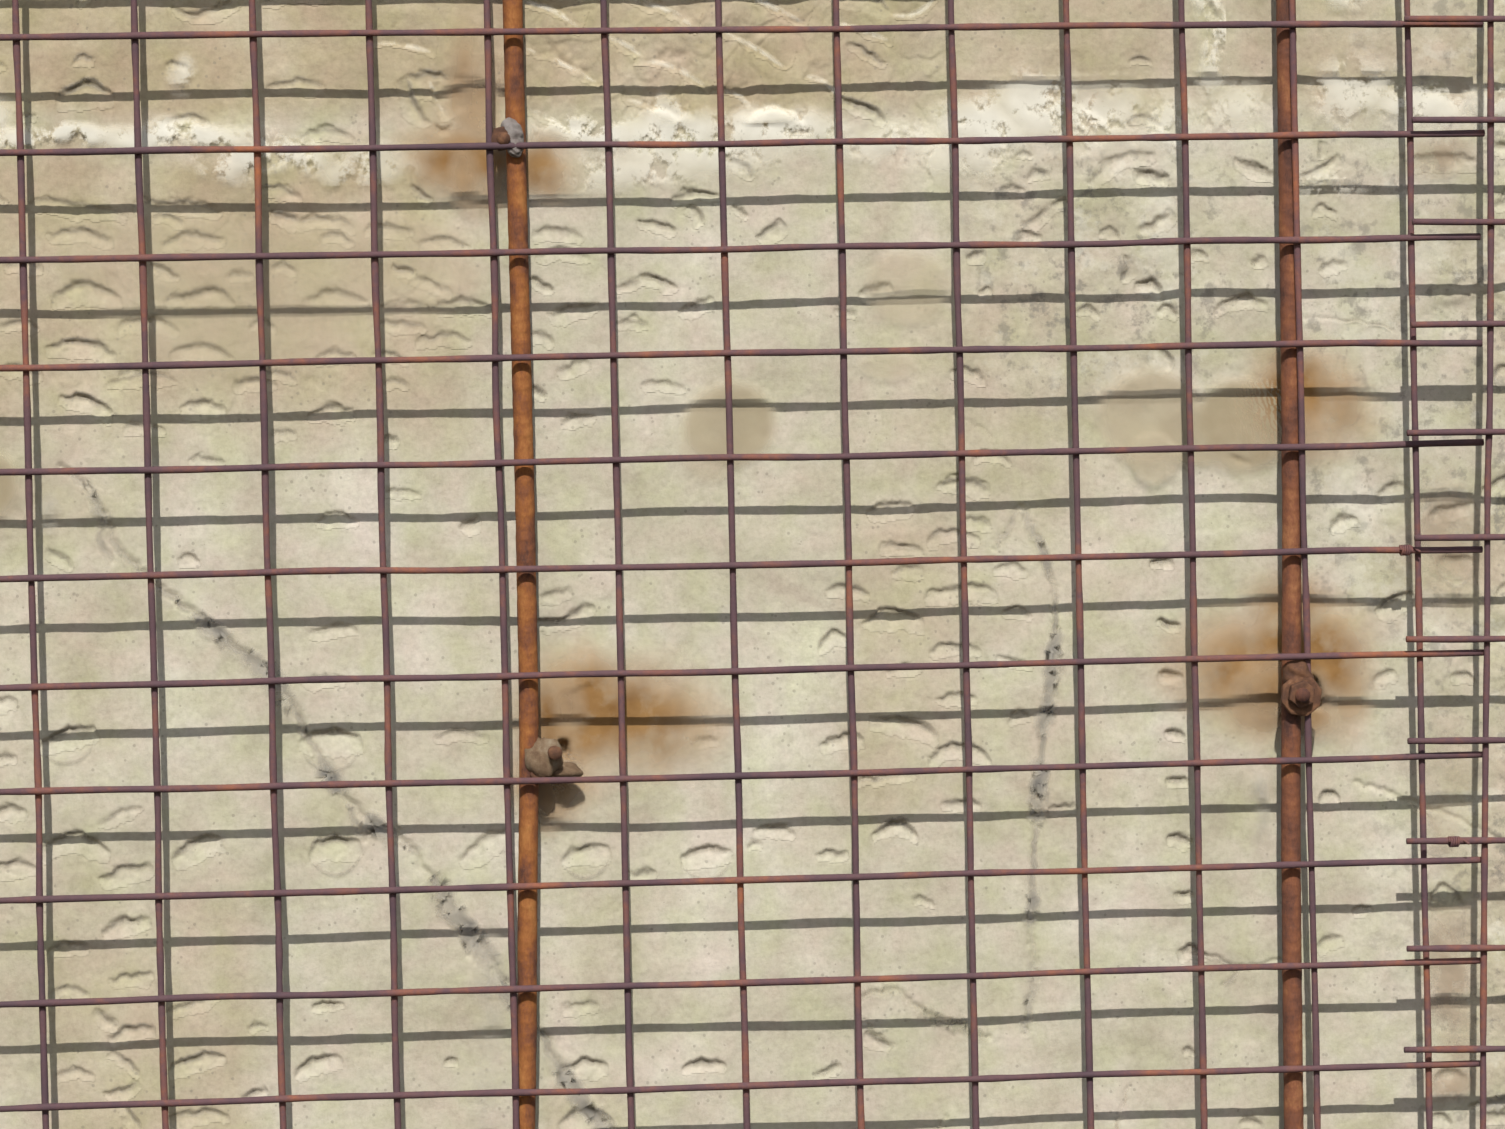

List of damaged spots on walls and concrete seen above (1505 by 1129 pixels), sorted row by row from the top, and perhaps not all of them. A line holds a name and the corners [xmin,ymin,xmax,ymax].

water stain [0,115,317,173]
water stain [546,102,827,177]
water stain [948,81,1120,163]
water stain [687,386,771,463]
water stain [1108,376,1282,469]
corrosion [1198,583,1282,732]
corrosion [1301,580,1363,731]
crack [137,568,490,957]
corrosion [538,654,705,815]
crack [1026,550,1062,924]
crack [499,993,518,1001]
crack [537,1030,613,1129]